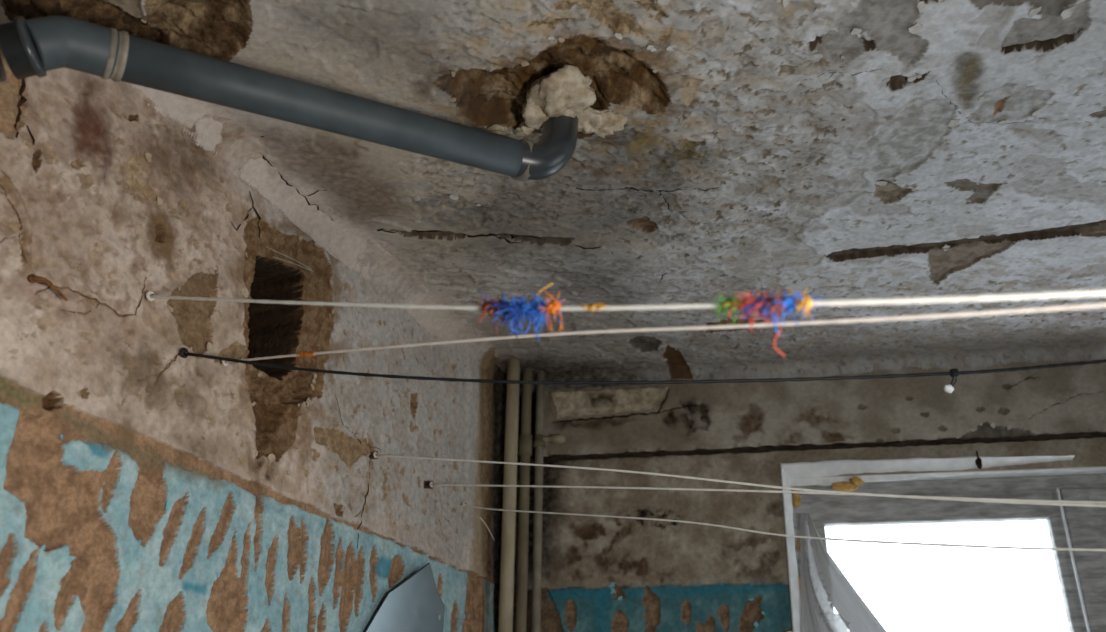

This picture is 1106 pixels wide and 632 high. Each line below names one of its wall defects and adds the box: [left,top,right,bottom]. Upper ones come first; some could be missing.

spalling [1,0,254,61]
crack [14,78,35,156]
spalling [434,0,946,262]
peeling [843,81,1106,237]
crack [0,183,147,317]
crack [377,229,550,243]
flaking render [513,586,580,632]